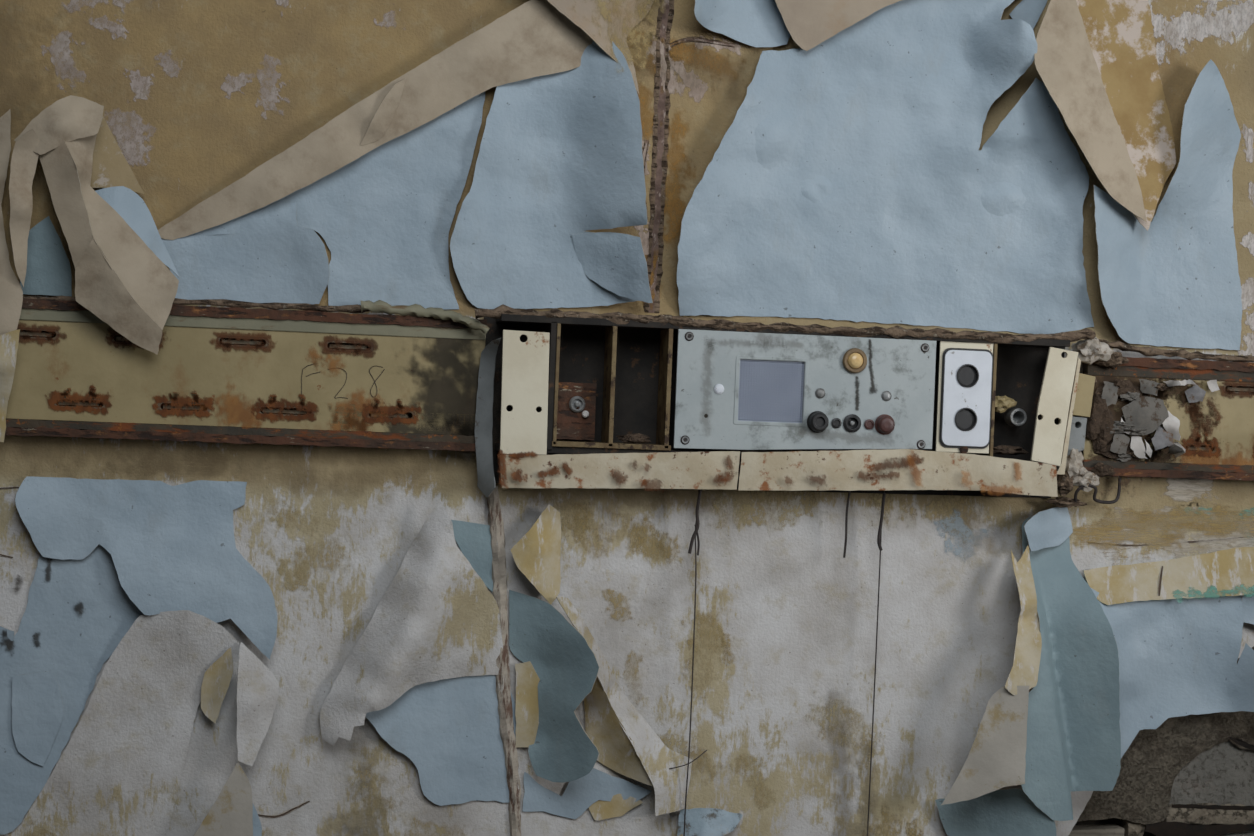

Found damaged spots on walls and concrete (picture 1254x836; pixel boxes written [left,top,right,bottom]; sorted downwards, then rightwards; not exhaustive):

peeling [0,0,1254,442]
corrosion [45,385,112,415]
corrosion [152,390,318,428]
corrosion [332,394,422,431]
corrosion [1181,381,1254,466]
corrosion [498,449,573,488]
corrosion [612,461,662,491]
corrosion [859,451,924,485]
damp [714,490,820,526]
peeling [935,378,1254,836]
peeling [0,476,279,836]
peeling [320,498,742,836]